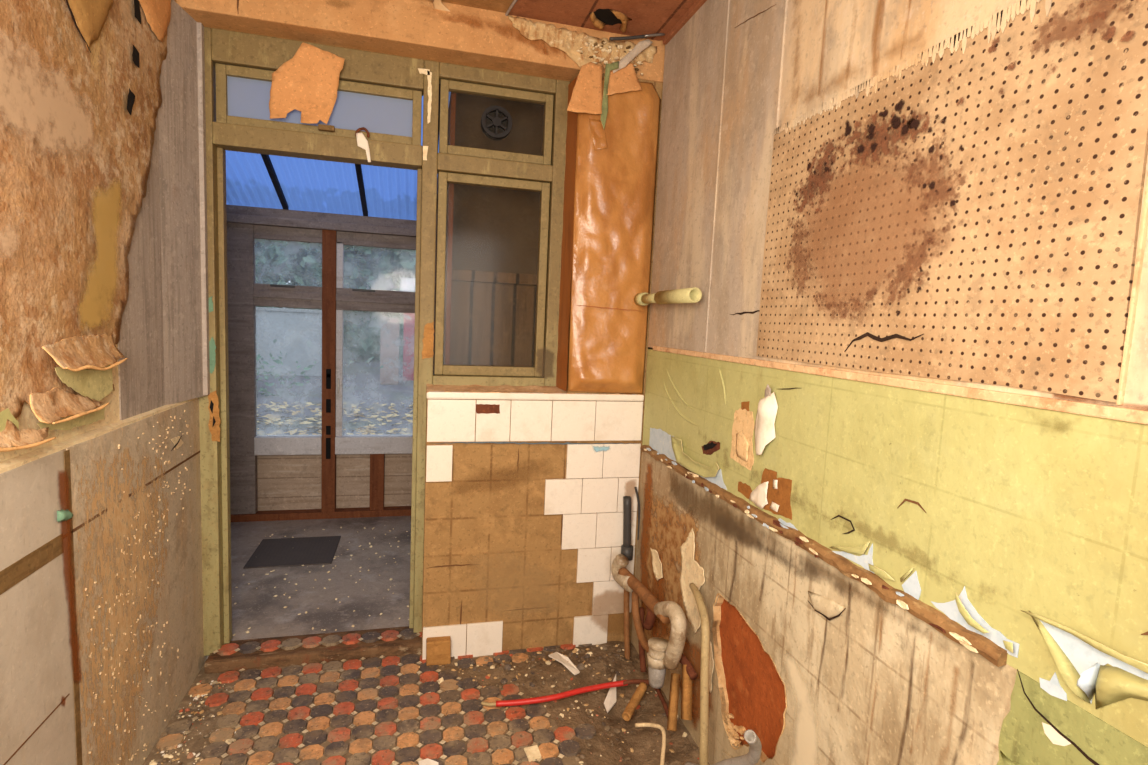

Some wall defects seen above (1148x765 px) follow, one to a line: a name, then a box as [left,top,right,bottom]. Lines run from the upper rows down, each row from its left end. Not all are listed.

leakage [1034,0,1134,51]
leakage [787,101,965,318]
crack [844,332,923,352]
peeling [736,384,796,462]
peeling [425,444,590,651]
leakage [646,478,760,625]
flaking render [644,428,1019,658]
leakage [806,559,857,604]
leakage [680,639,711,726]
flaking render [680,528,787,763]
crack [1017,669,1100,765]
flaking render [1040,620,1148,680]